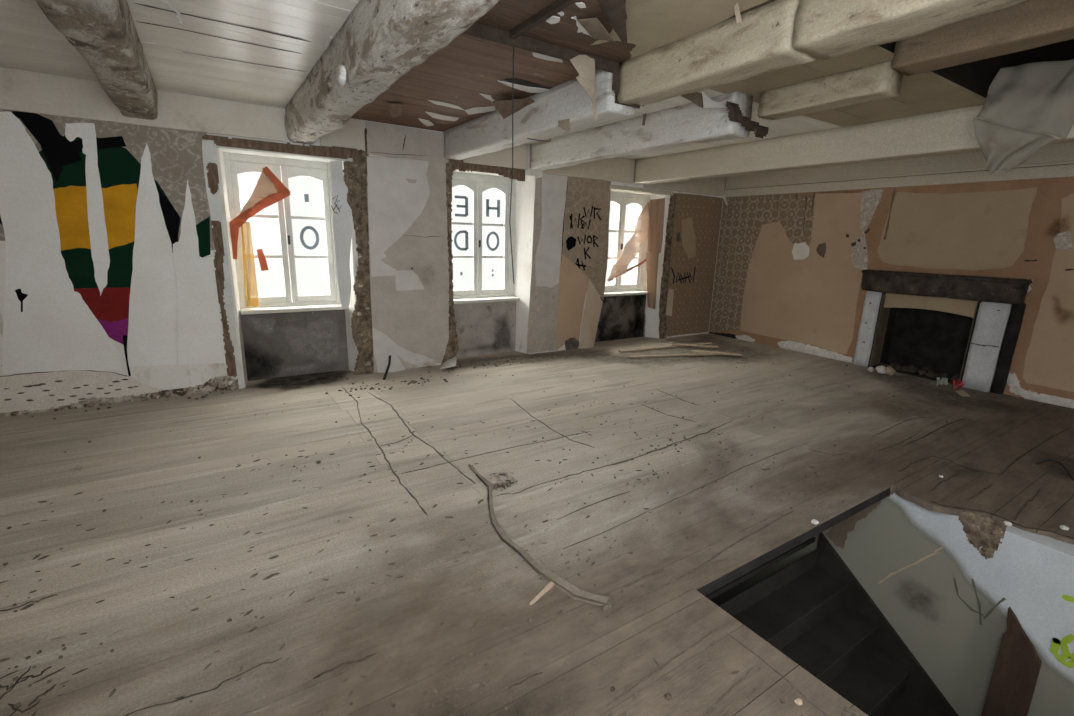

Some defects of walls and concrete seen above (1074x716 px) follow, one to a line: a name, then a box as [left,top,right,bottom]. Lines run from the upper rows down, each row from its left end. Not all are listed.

peeling [546,0,628,50]
peeling [418,80,549,127]
peeling [532,52,597,122]
peeling [206,162,219,194]
peeling [330,137,459,375]
peeling [529,174,568,345]
peeling [0,221,239,417]
crack [343,388,731,516]
crack [559,446,848,549]
crack [0,580,56,611]
crack [0,666,65,716]
crack [125,658,281,716]